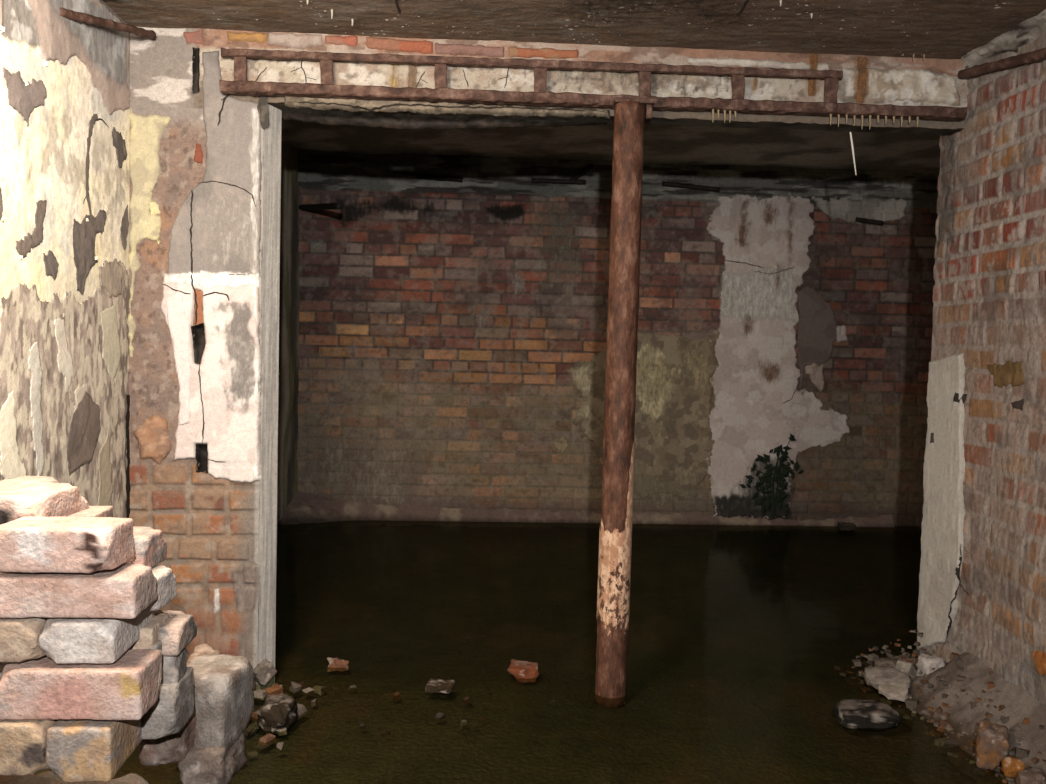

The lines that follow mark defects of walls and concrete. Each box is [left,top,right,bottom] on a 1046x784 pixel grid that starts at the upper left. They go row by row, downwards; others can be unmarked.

corrosion [390,64,417,88]
corrosion [808,54,817,96]
corrosion [856,57,869,103]
peeling [0,0,191,518]
crack [163,181,256,473]
peeling [804,363,824,392]